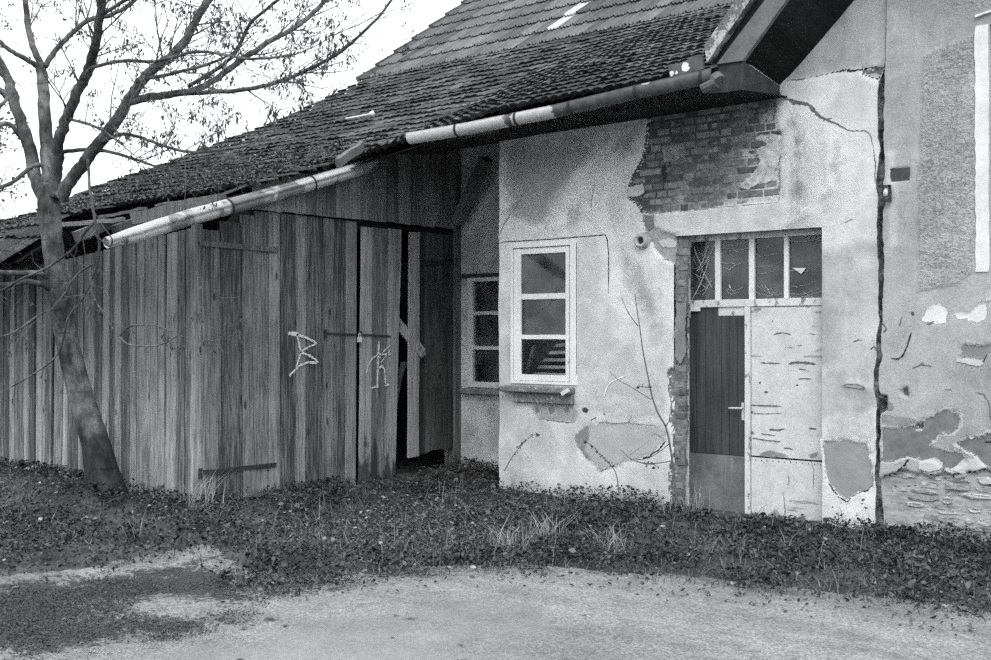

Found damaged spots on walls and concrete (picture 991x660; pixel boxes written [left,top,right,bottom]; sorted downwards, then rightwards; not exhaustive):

spalling [532,404,578,423]
flaking render [626,98,783,507]
peeling [751,428,792,458]
crack [780,5,991,527]
flaking render [809,396,991,541]
spalling [956,339,991,366]